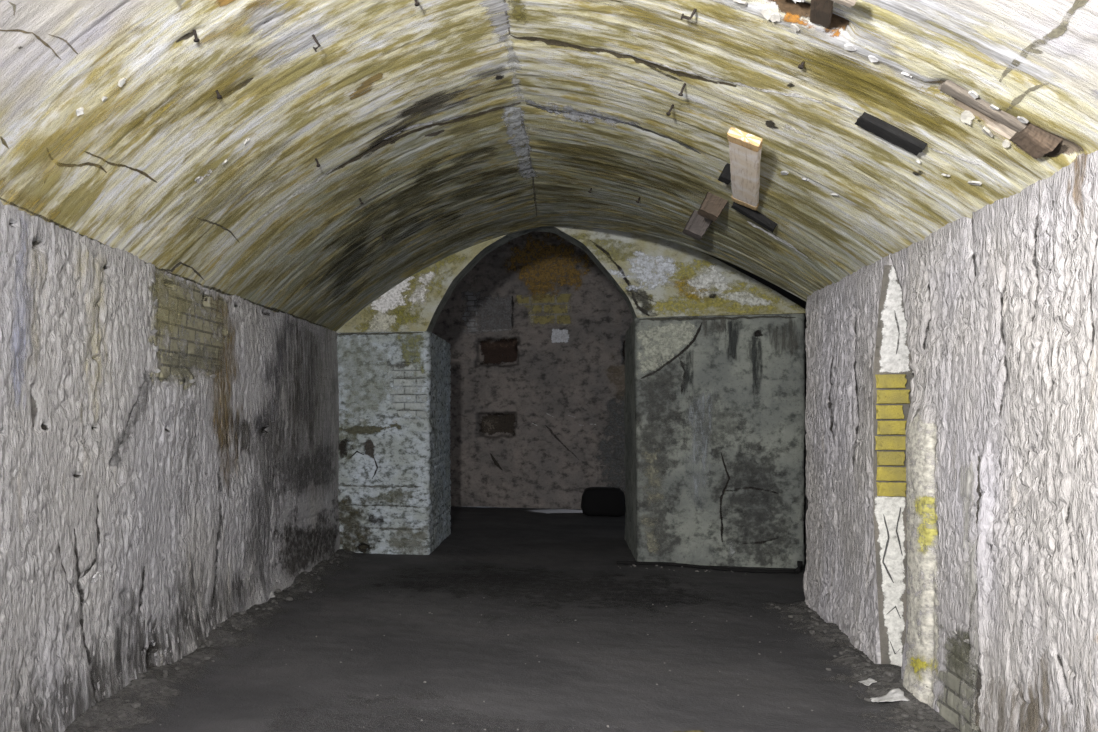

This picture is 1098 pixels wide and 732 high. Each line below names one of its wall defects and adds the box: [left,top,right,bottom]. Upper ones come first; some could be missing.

crack [0,29,78,60]
crack [503,0,854,110]
spalling [761,0,811,32]
spalling [824,13,856,51]
crack [44,148,157,183]
water stain [312,199,461,303]
crack [590,240,796,394]
water stain [234,317,427,587]
water stain [635,319,804,566]